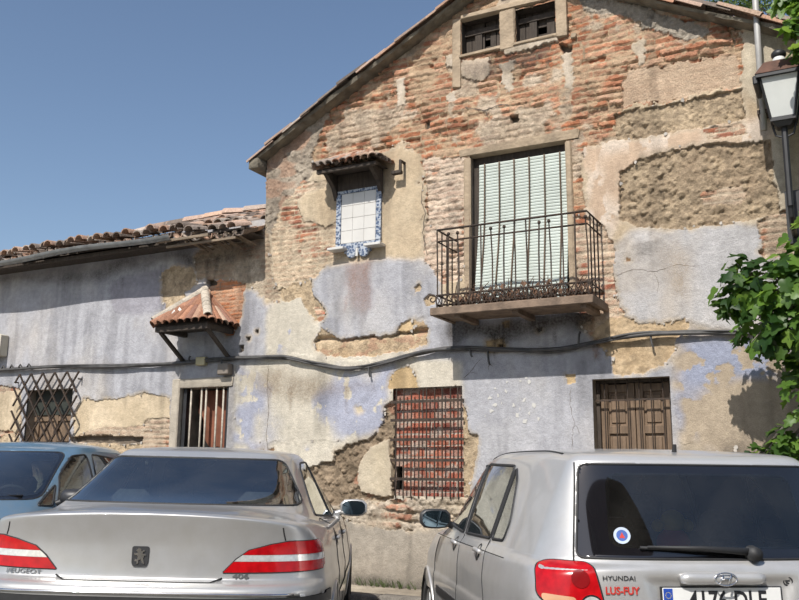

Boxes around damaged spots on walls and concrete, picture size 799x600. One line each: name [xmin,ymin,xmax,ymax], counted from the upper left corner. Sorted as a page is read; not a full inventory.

flaking render [159,0,799,532]
flaking render [0,385,22,442]
flaking render [72,393,171,454]